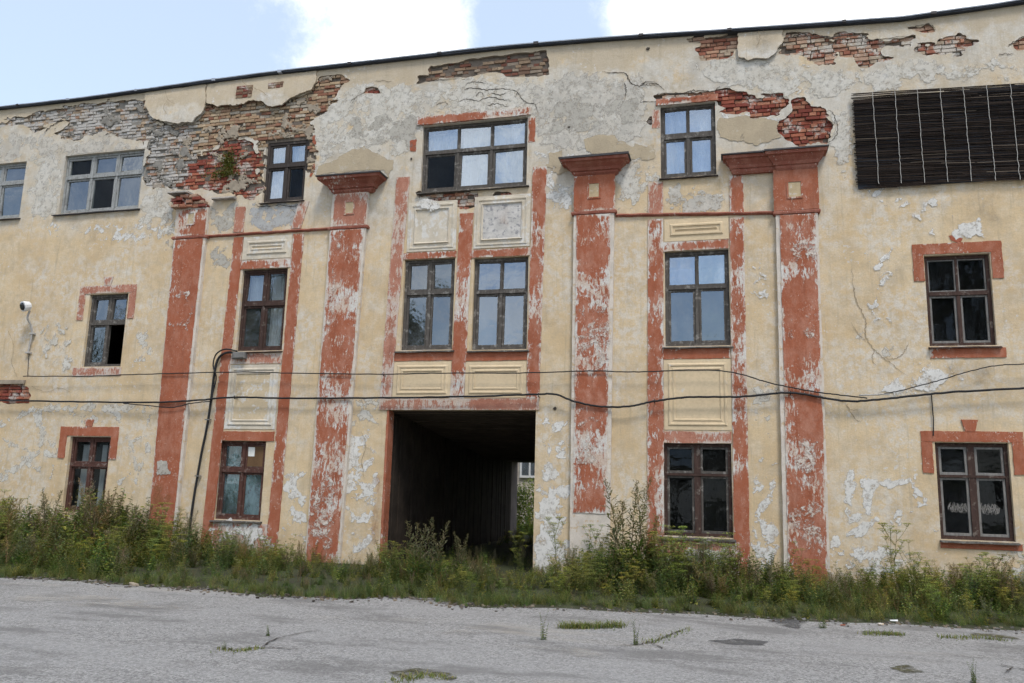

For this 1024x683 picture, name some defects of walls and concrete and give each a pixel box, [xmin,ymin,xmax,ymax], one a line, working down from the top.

crack [352,77,540,108]
flaking render [0,25,1017,248]
flaking render [1013,38,1024,51]
peeling [577,300,611,370]
crack [851,271,908,373]
peeling [880,363,964,396]
peeling [282,399,380,553]
peeling [534,407,598,572]
peeling [795,440,818,473]
peeling [789,469,927,577]